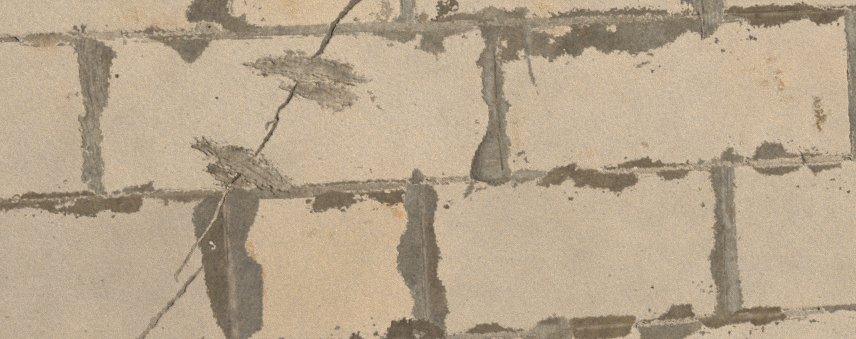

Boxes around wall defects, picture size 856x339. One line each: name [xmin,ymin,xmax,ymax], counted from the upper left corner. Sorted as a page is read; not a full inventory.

crack [310,0,361,61]
crack [135,82,298,339]